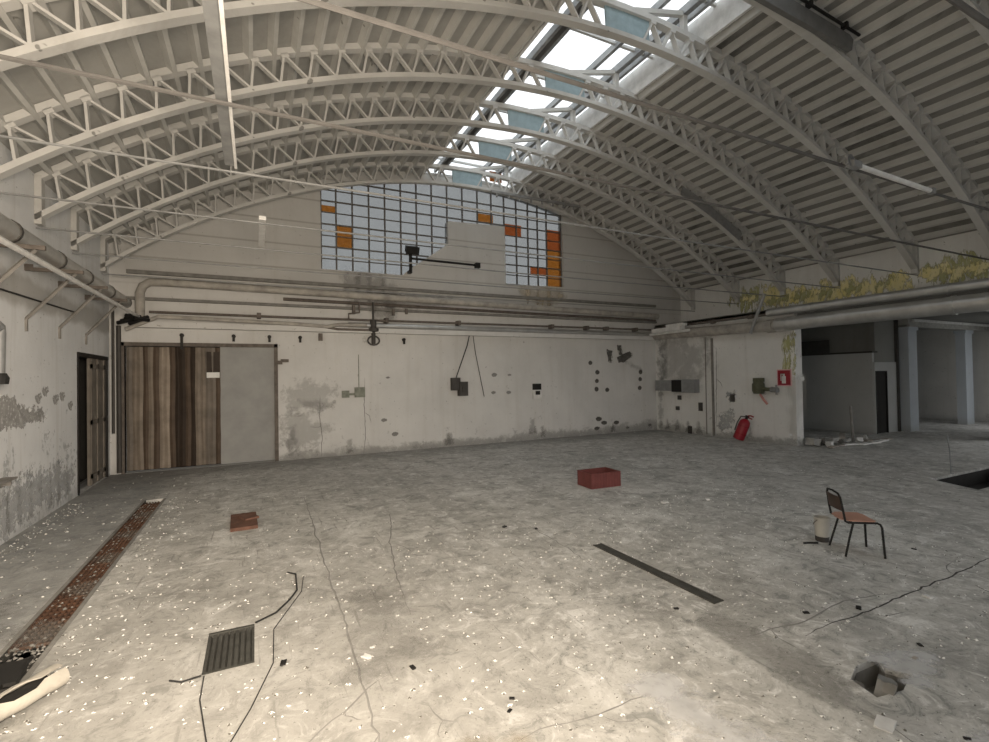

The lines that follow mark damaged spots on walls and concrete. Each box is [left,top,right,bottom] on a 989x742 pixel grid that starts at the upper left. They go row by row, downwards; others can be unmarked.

flaking render [0,386,73,432]
crack [304,499,414,742]
crack [710,558,989,647]
crack [429,706,457,737]